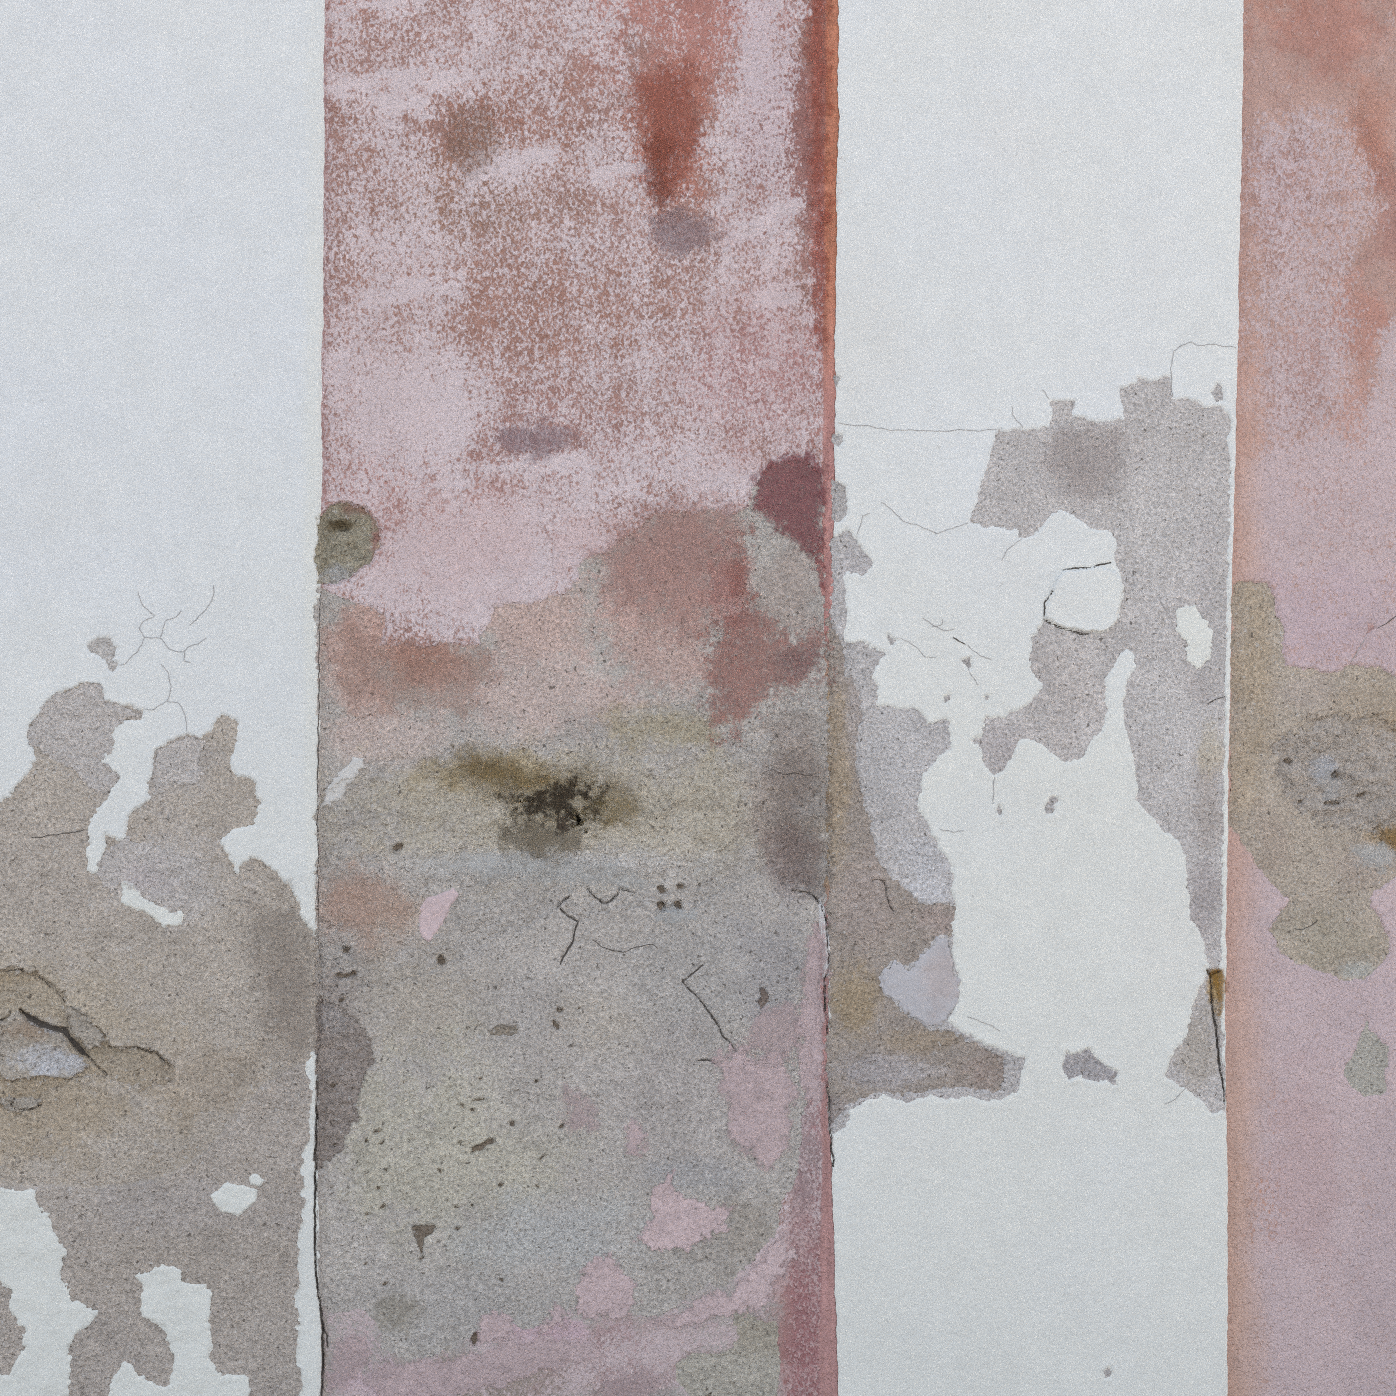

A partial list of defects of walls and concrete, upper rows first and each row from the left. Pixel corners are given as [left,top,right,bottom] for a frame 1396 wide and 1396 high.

crack [119,585,214,731]
peeling [970,376,1396,1113]
leakage [436,772,645,891]
peeling [0,464,1025,1396]
crack [557,887,658,965]
crack [682,965,735,1064]
corrosion [1209,969,1226,1016]
crack [313,1049,329,1395]